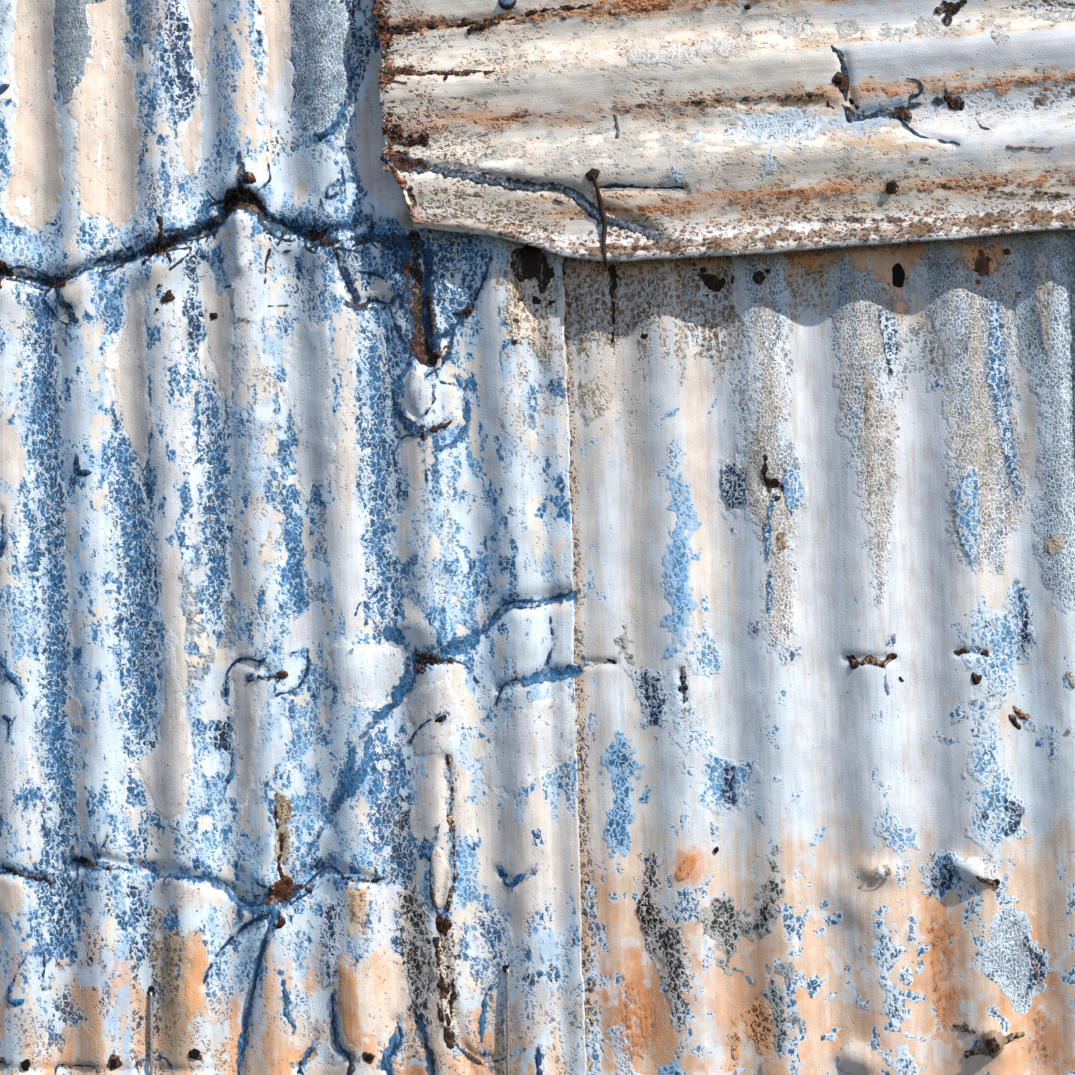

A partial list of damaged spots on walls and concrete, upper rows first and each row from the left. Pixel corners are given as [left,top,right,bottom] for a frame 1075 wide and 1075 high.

peeling [0,0,143,236]
peeling [253,0,358,133]
rust [372,0,759,93]
rust [934,0,967,25]
rust [922,71,1075,106]
rust [381,119,1075,371]
peeling [323,328,470,764]
peeling [717,252,809,665]
peeling [825,229,1075,901]
peeling [599,471,783,1033]
crack [339,869,391,890]
rust [432,914,461,1049]